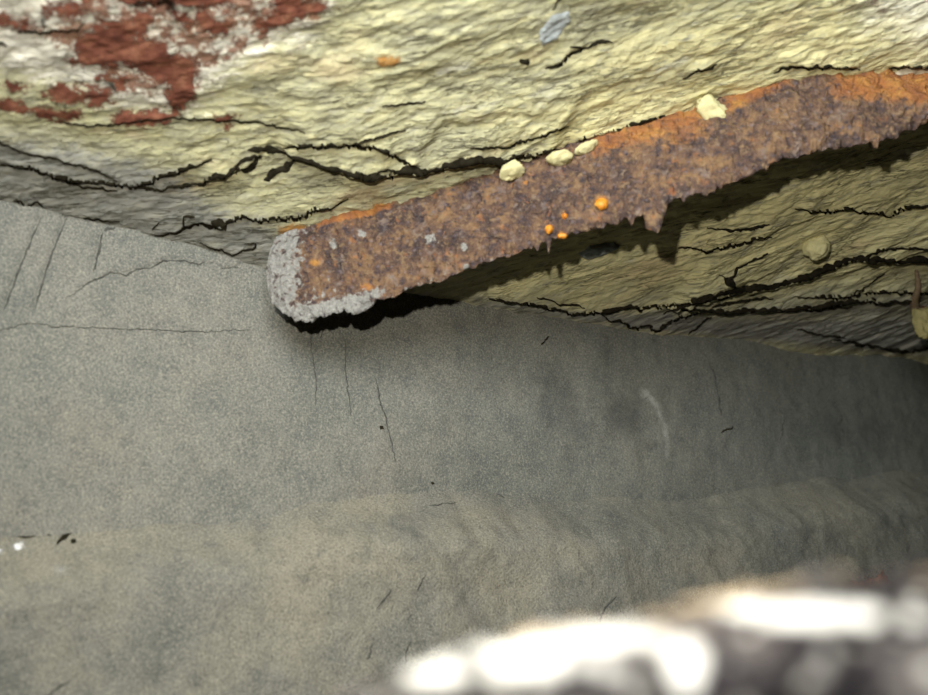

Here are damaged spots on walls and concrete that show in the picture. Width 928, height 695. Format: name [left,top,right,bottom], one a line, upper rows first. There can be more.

peeling [538,11,571,46]
corrosion [0,0,328,132]
corrosion [378,56,400,67]
crack [545,39,613,69]
crack [382,100,426,108]
crack [0,115,666,298]
corrosion [266,69,928,323]
peeling [578,242,620,260]
crack [489,224,928,354]